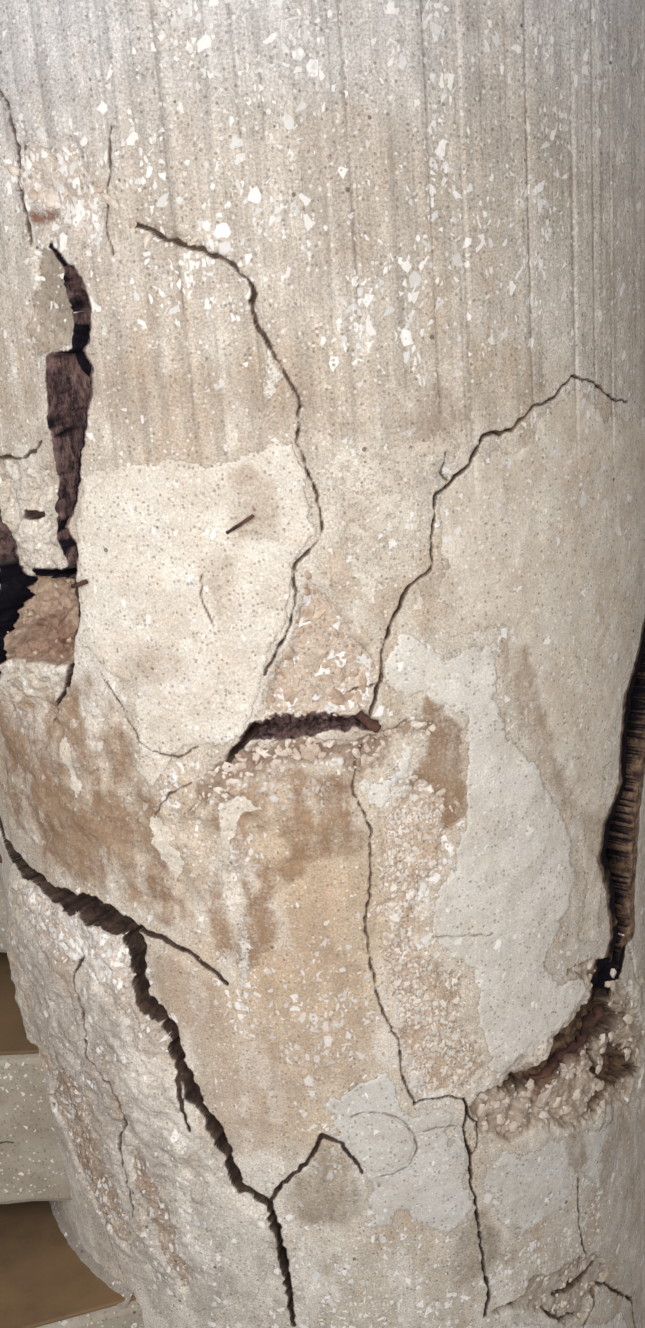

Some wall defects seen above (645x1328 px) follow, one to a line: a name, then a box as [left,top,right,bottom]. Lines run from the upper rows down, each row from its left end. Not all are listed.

crack [0,90,33,243]
spalling [26,250,75,355]
crack [0,441,42,460]
crack [106,126,323,675]
crack [106,682,199,814]
flaking render [0,389,645,1244]
crack [350,375,635,1328]
crack [74,955,134,1217]
spalling [127,1148,190,1286]
spalling [496,1253,628,1328]